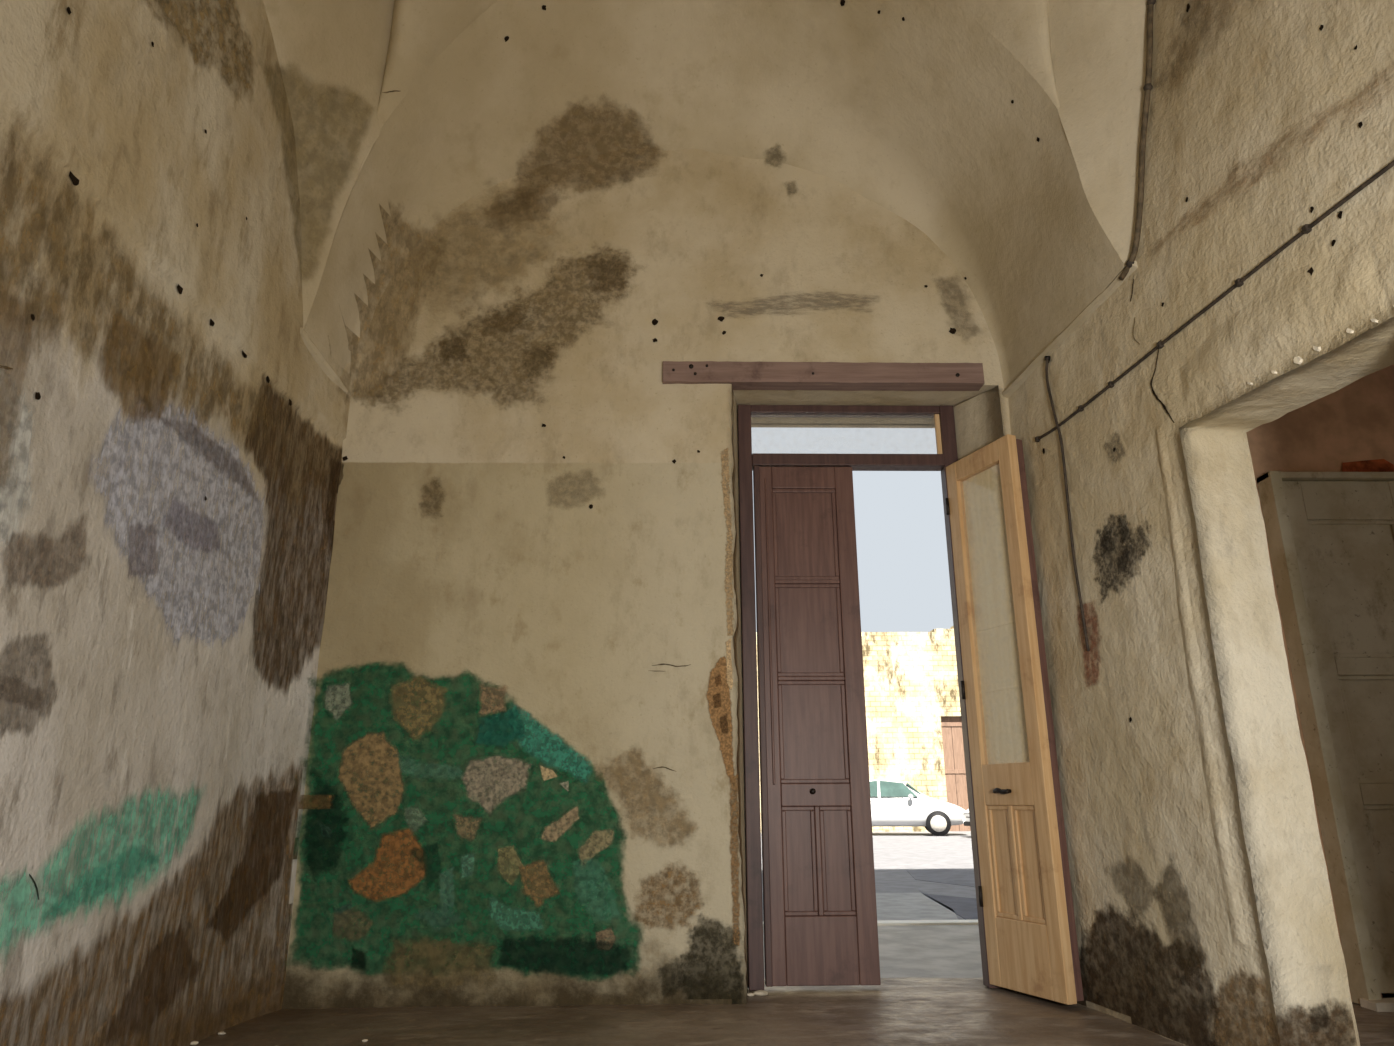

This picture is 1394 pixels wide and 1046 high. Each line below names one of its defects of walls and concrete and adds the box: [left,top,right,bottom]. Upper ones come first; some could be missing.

mould [521,107,657,200]
leakage [339,205,629,402]
leakage [0,142,344,691]
mould [1093,515,1149,603]
leakage [610,752,693,844]
leakage [636,867,744,1004]
leakage [1077,870,1355,1046]